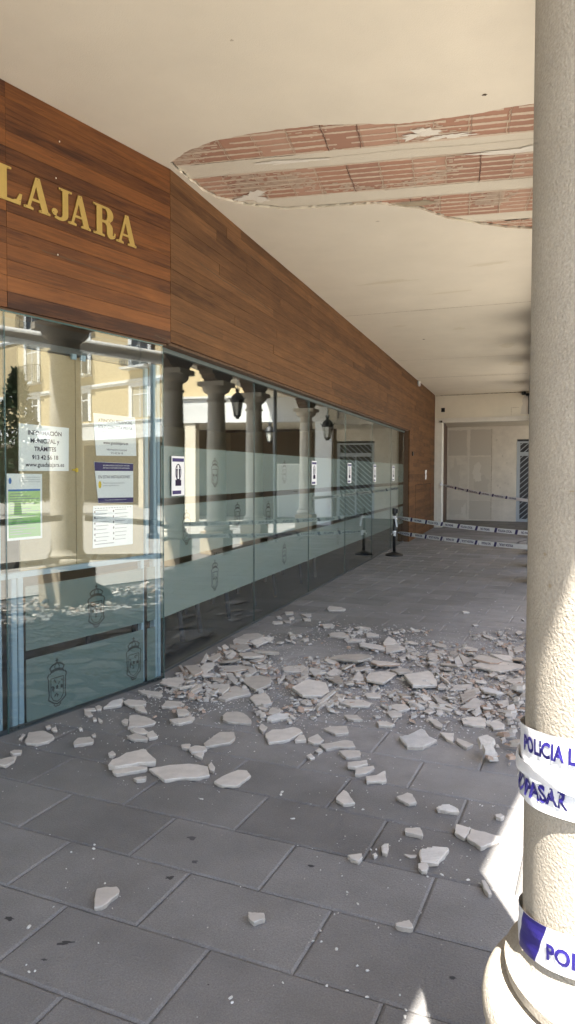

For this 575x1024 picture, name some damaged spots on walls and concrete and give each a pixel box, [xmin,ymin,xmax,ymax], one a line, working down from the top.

spalling [171,104,534,229]